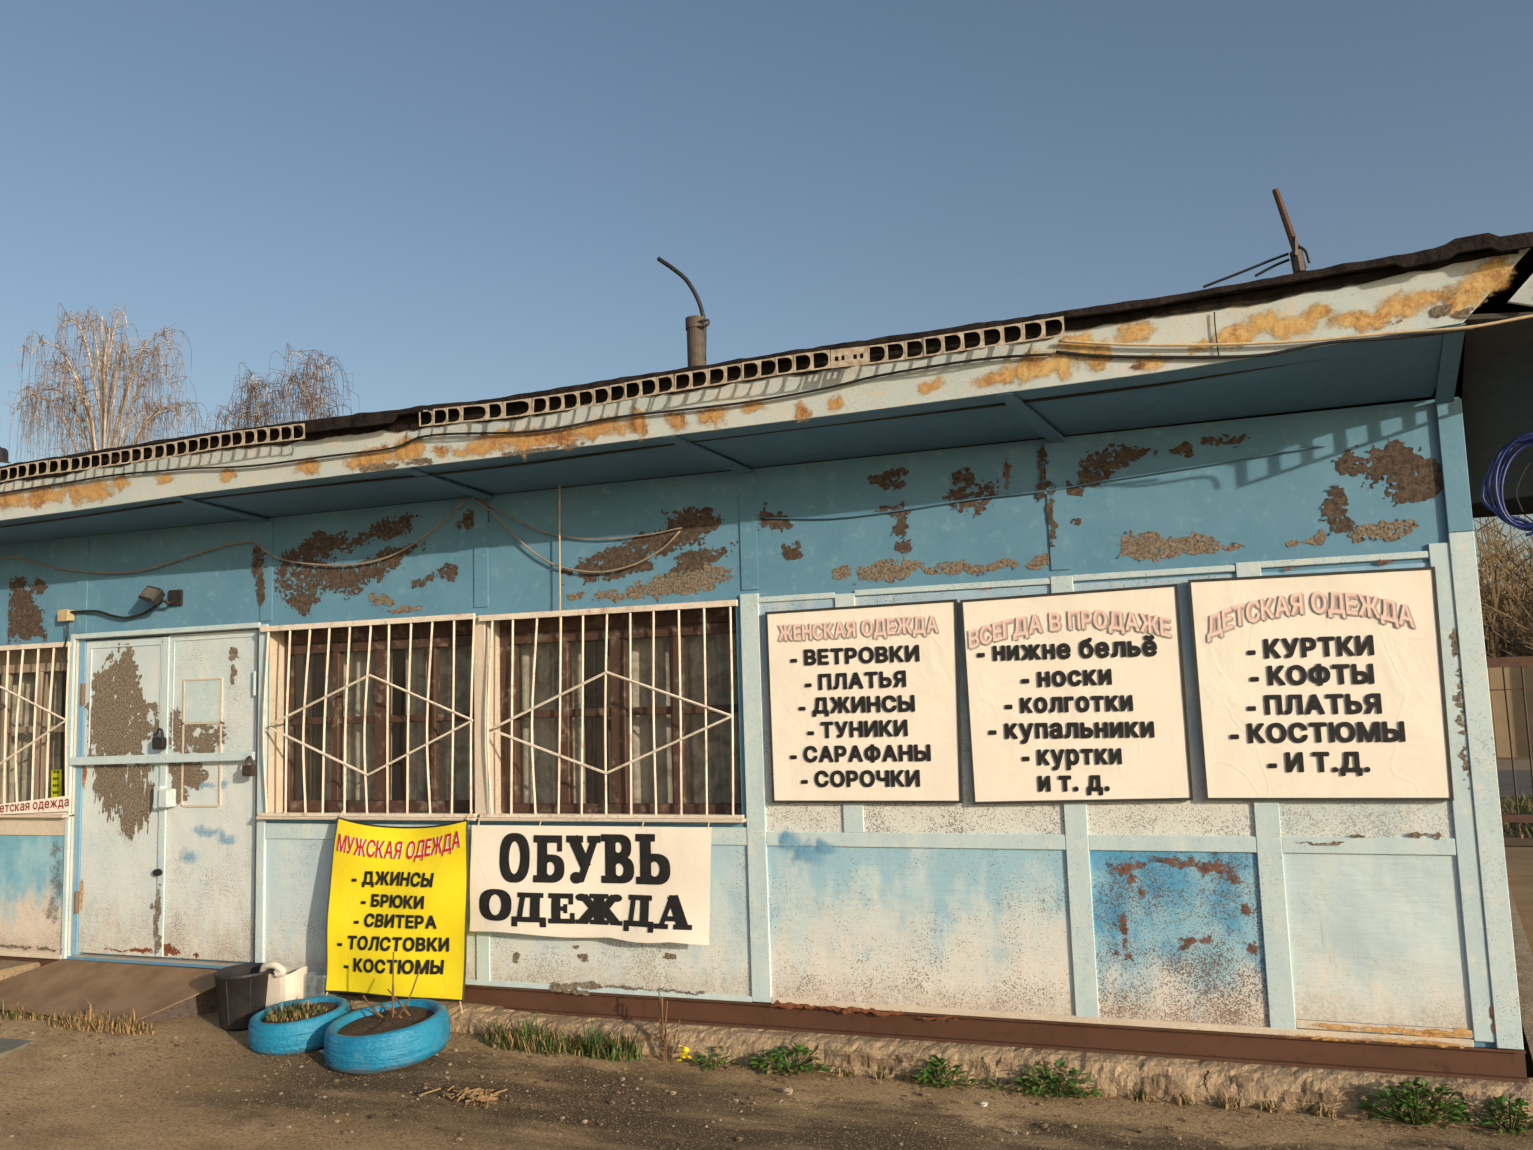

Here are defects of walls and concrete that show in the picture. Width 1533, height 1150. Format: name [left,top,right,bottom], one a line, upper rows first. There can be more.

peeling [1431,304,1474,319]
peeling [7,575,51,645]
peeling [251,508,459,617]
peeling [550,506,739,603]
peeling [832,433,1252,585]
peeling [1286,438,1444,547]
peeling [84,643,229,841]
corrosion [1105,852,1248,897]
corrosion [1112,907,1136,962]
corrosion [1179,935,1214,950]